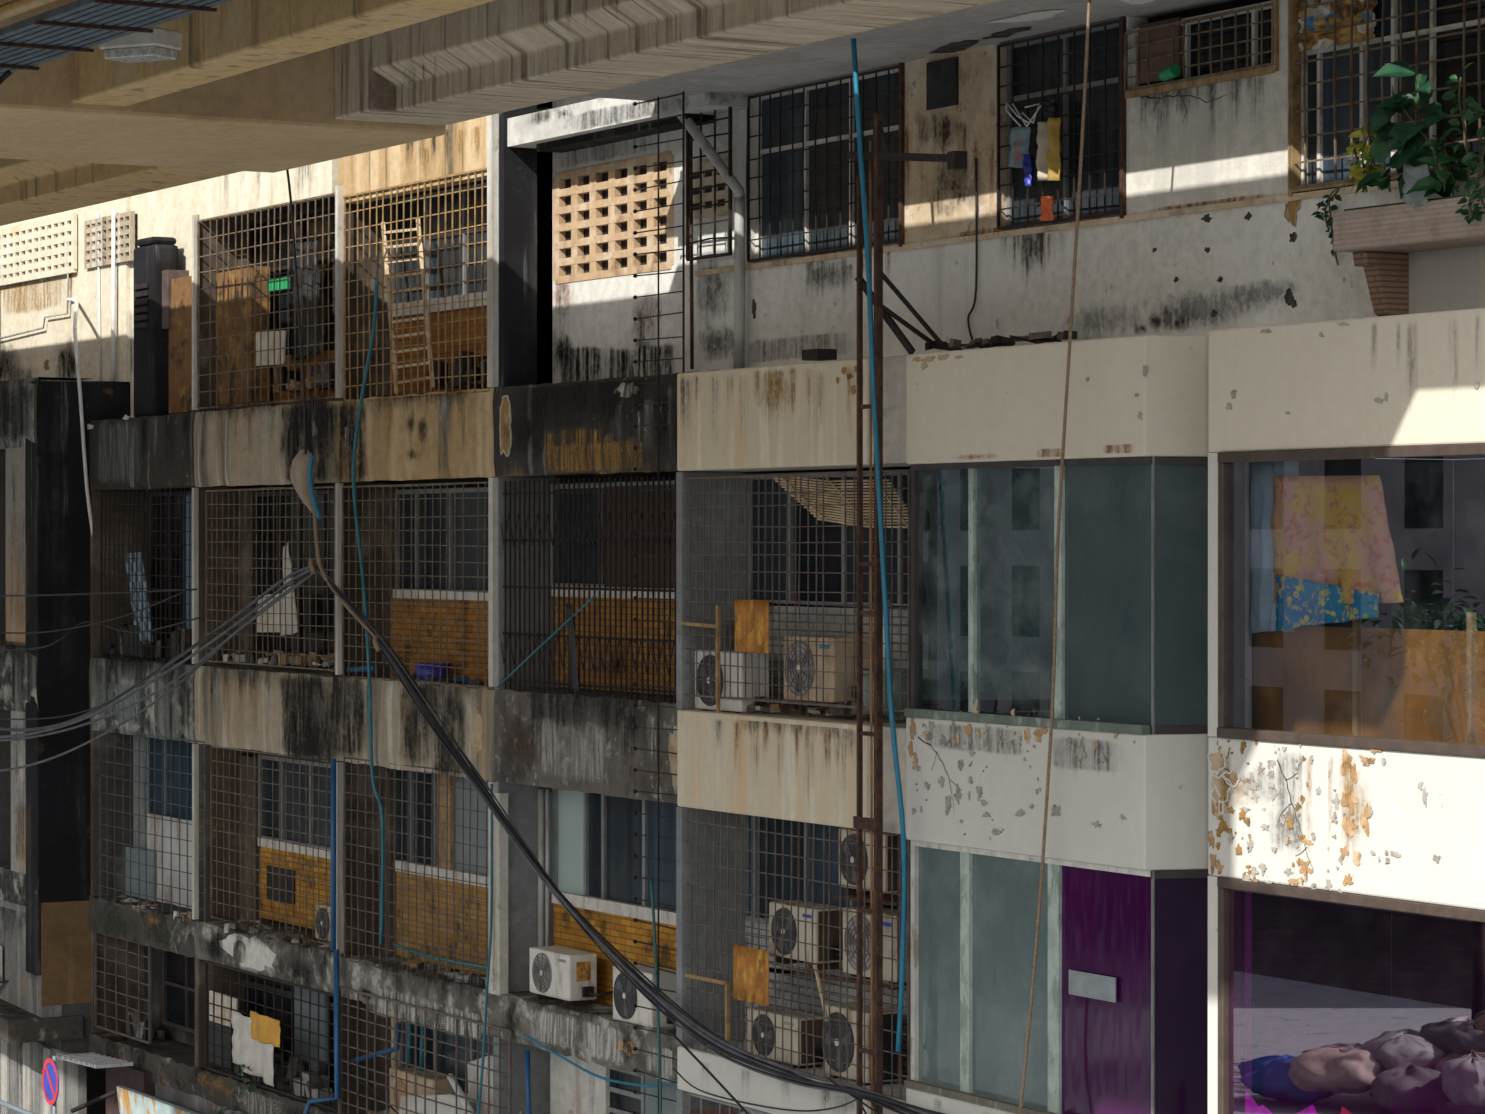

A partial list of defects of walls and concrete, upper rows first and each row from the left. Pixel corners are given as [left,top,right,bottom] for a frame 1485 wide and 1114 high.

peeling [1284,192,1302,242]
water stain [1083,282,1292,332]
peeling [1284,288,1297,308]
water stain [518,301,717,457]
rust [756,370,795,406]
water stain [103,391,466,484]
water stain [210,665,367,761]
water stain [401,684,463,775]
rust [718,721,836,758]
peeling [908,698,1061,841]
peeling [1207,740,1402,893]
spalling [219,934,276,971]